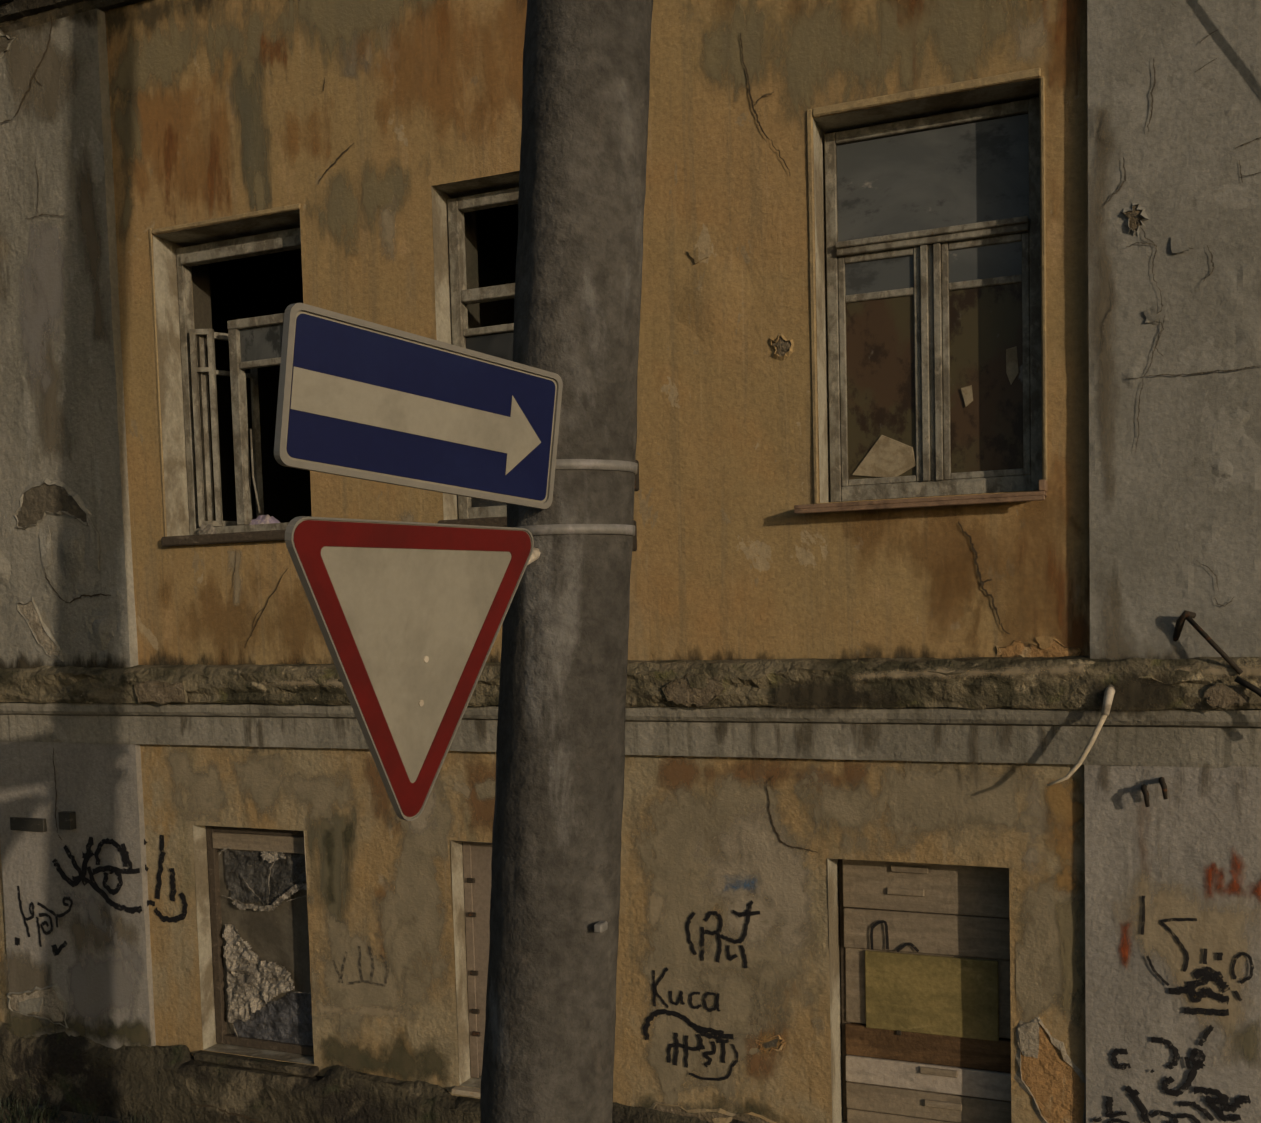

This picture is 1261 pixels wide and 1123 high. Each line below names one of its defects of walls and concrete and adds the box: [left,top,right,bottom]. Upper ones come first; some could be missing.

crack [1,15,52,123]
leakage [0,0,448,236]
crack [740,33,790,173]
leakage [700,0,1047,124]
leakage [77,152,105,340]
leakage [20,224,64,453]
flaking render [14,478,100,571]
crack [244,570,287,648]
crack [958,521,1010,634]
leakage [1131,873,1260,1064]
leakage [322,1037,447,1082]
flaking render [1014,1016,1086,1123]